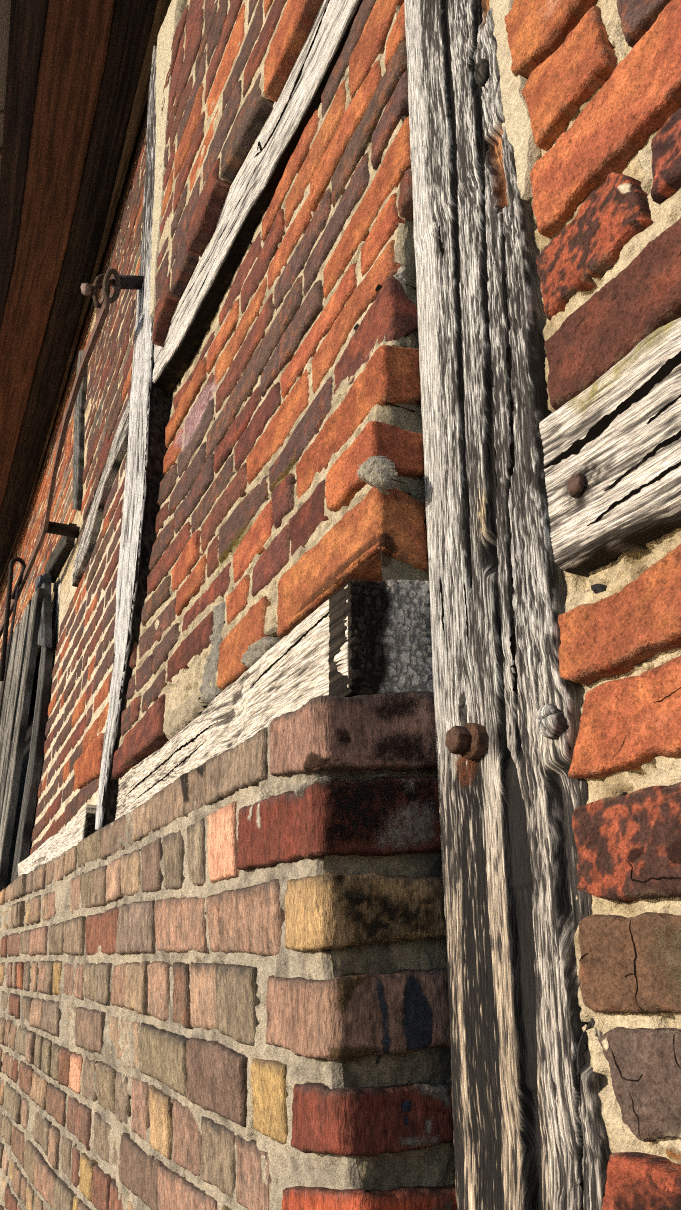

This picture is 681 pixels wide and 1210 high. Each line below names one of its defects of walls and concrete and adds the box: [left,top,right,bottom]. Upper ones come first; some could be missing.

crack [477,0,485,24]
crack [448,8,488,194]
crack [437,225,445,258]
crack [487,302,515,487]
crack [544,351,681,526]
crack [499,567,518,697]
crack [624,920,639,1007]